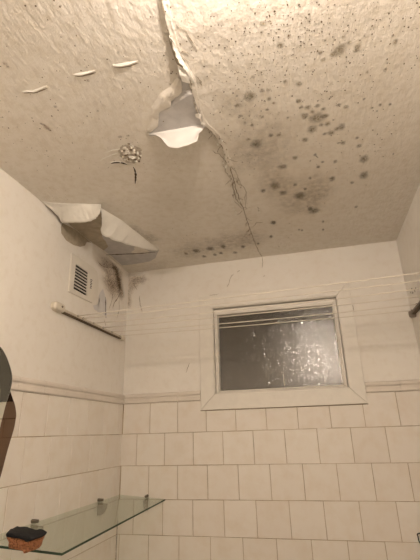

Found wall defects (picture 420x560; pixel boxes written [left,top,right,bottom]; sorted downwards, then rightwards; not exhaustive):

peeling [146,36,206,148]
crack [157,0,263,266]
damp [223,2,381,130]
peeling [42,201,159,265]